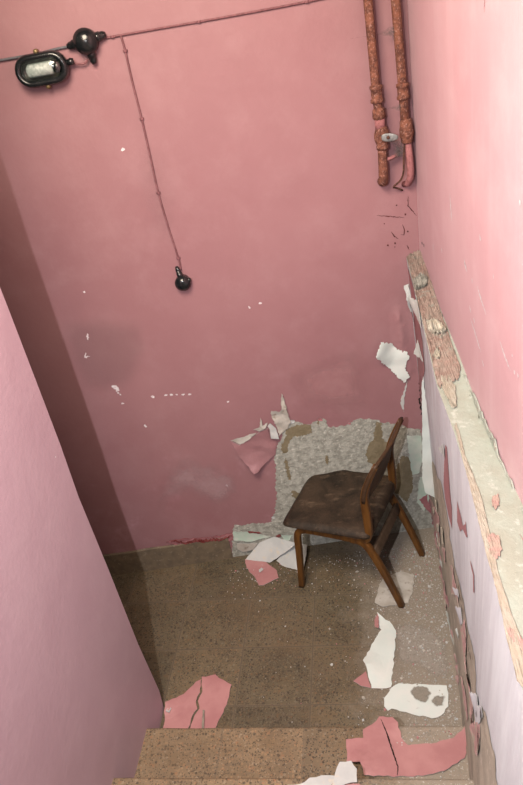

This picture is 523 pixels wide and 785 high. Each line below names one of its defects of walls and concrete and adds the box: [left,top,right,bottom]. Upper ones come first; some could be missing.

peeling [169,250,523,785]